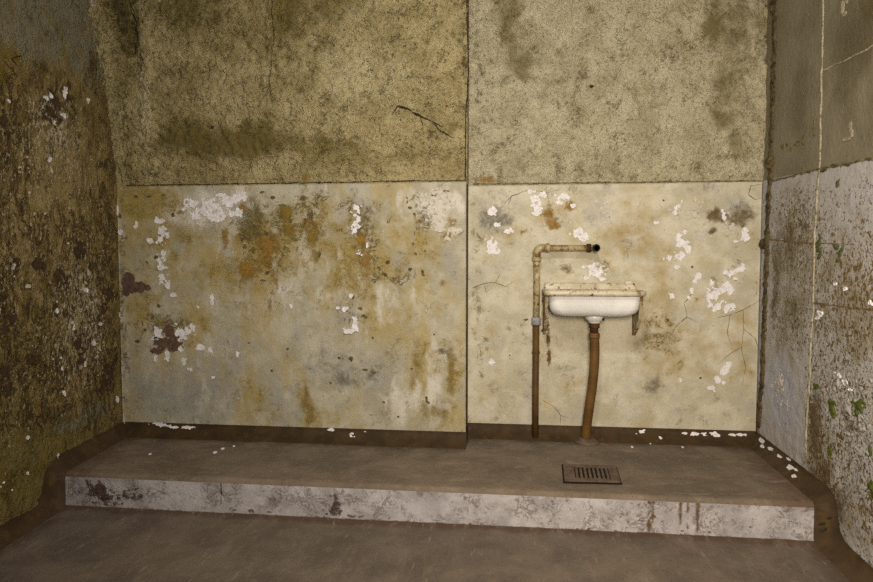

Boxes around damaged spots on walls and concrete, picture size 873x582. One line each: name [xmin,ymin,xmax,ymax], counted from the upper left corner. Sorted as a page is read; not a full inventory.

crack [392,105,454,138]
peeling [350,204,362,235]
peeling [406,187,462,241]
peeling [484,206,514,255]
peeling [528,189,576,216]
peeling [569,227,589,242]
peeling [558,256,612,282]
peeling [663,196,750,314]
peeling [31,191,247,403]
peeling [699,362,732,392]
damp [810,390,821,451]